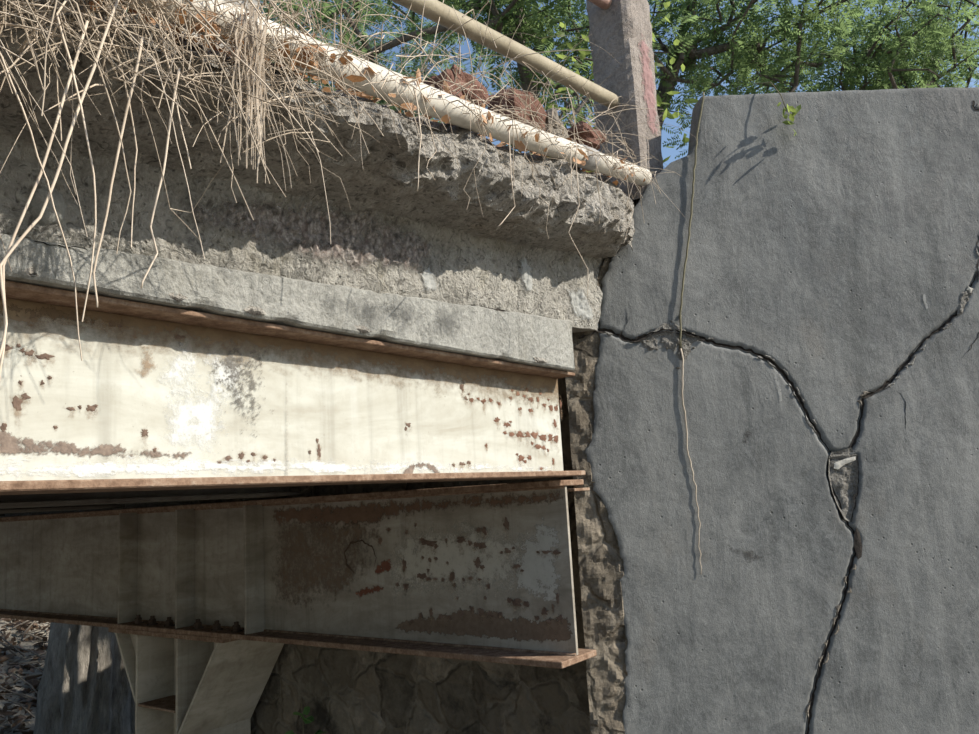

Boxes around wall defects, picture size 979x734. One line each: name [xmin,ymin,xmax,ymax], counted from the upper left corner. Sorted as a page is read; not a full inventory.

crack [970,237,979,287]
rust [0,297,562,471]
rust [273,491,563,574]
rust [395,526,573,643]
crack [579,313,957,734]